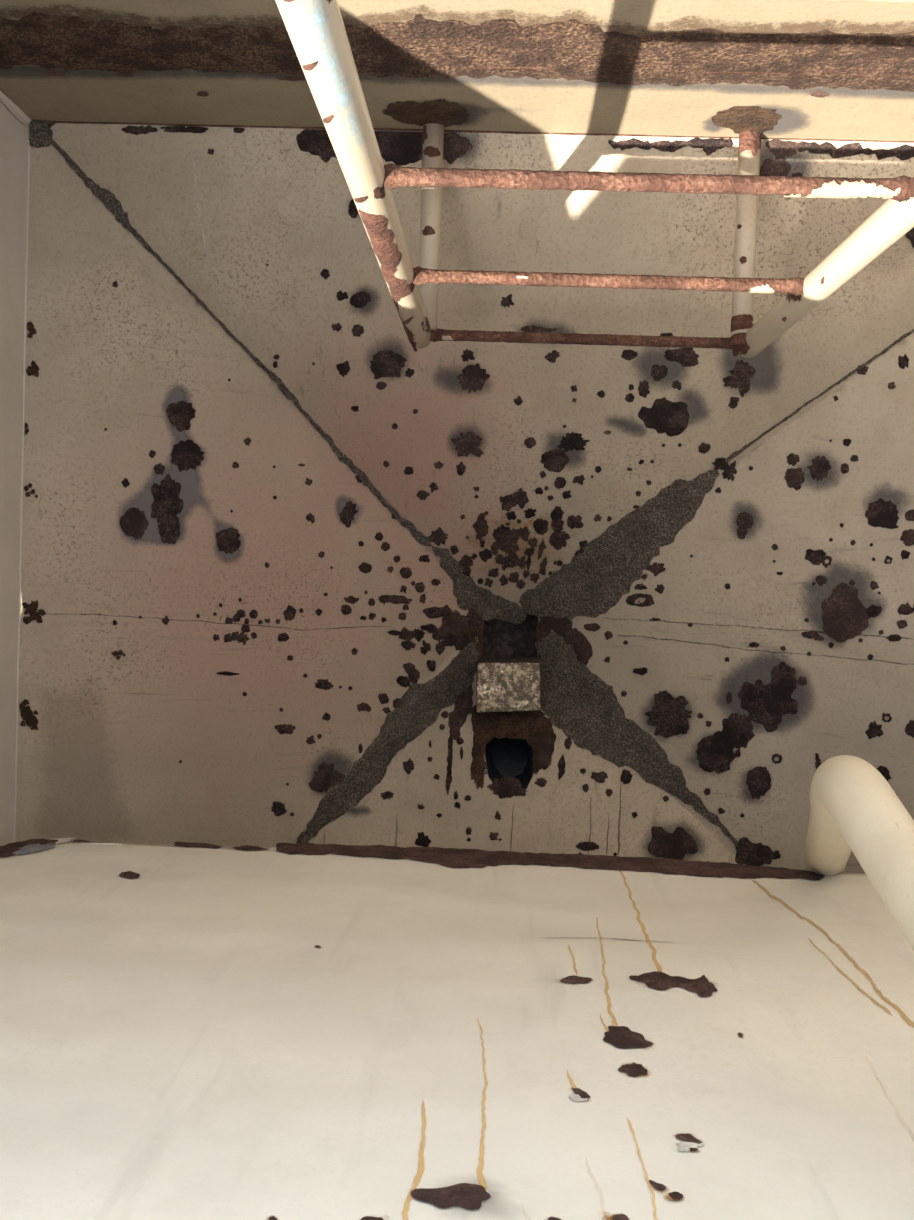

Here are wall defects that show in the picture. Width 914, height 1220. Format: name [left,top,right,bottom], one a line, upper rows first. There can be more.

rust [0,6,304,75]
rust [342,6,914,92]
rust [296,129,337,163]
rust [608,106,914,177]
crack [47,613,389,630]
rust [341,425,612,714]
peeling [296,469,740,851]
rust [644,642,810,774]
crack [606,618,909,665]
rust [174,678,914,1026]
rust [560,918,654,1049]
rust [402,1021,491,1220]